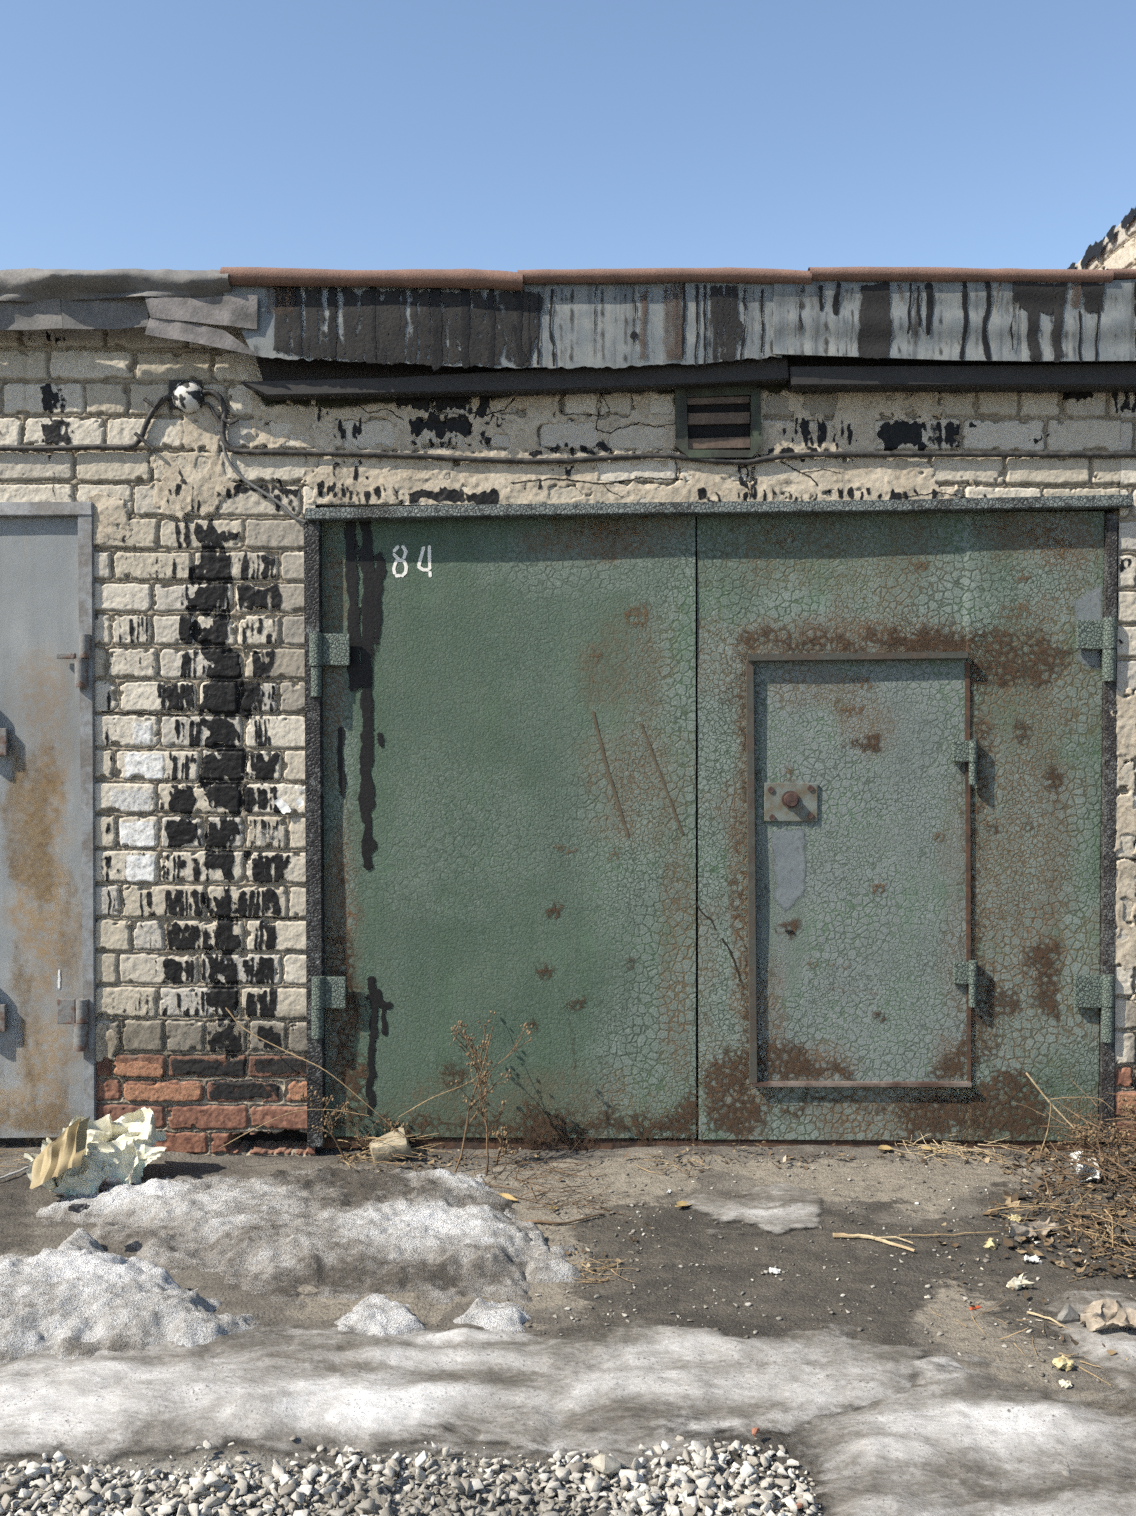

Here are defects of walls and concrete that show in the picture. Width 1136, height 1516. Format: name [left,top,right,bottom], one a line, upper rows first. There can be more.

spalling [687,396,750,450]
corrosion [731,603,1071,849]
corrosion [328,871,1062,1149]
crack [696,902,741,983]